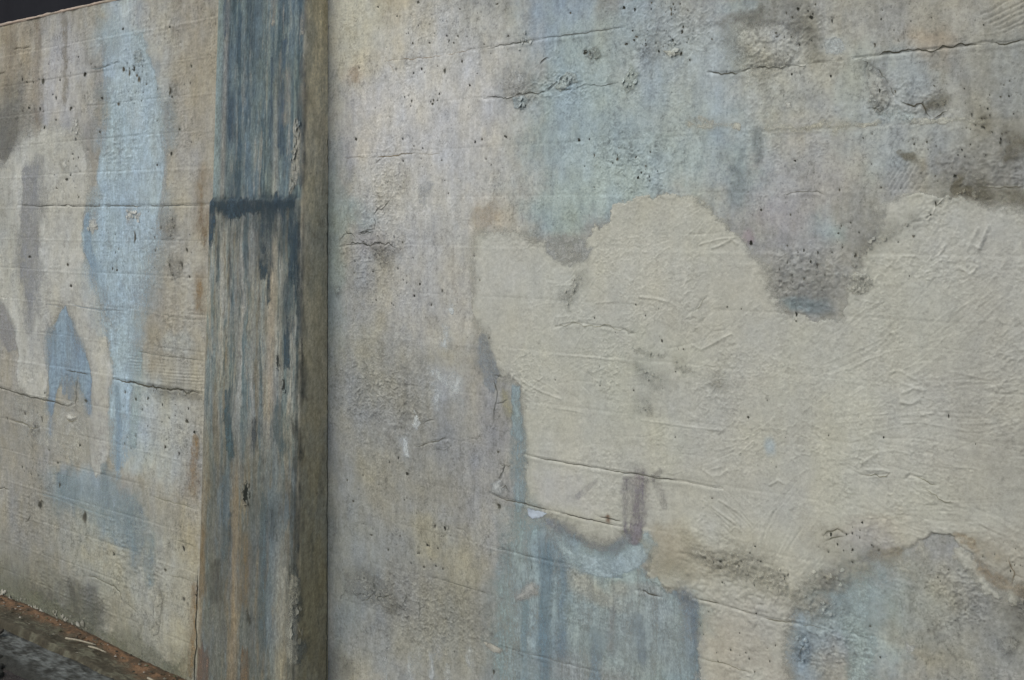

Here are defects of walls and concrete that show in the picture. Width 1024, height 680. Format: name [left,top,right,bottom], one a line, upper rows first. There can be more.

crack [486,27,618,99]
crack [710,40,1020,120]
leakage [209,102,306,394]
crack [116,379,202,394]
leakage [222,387,234,459]
crack [326,203,447,677]
leakage [494,513,703,680]